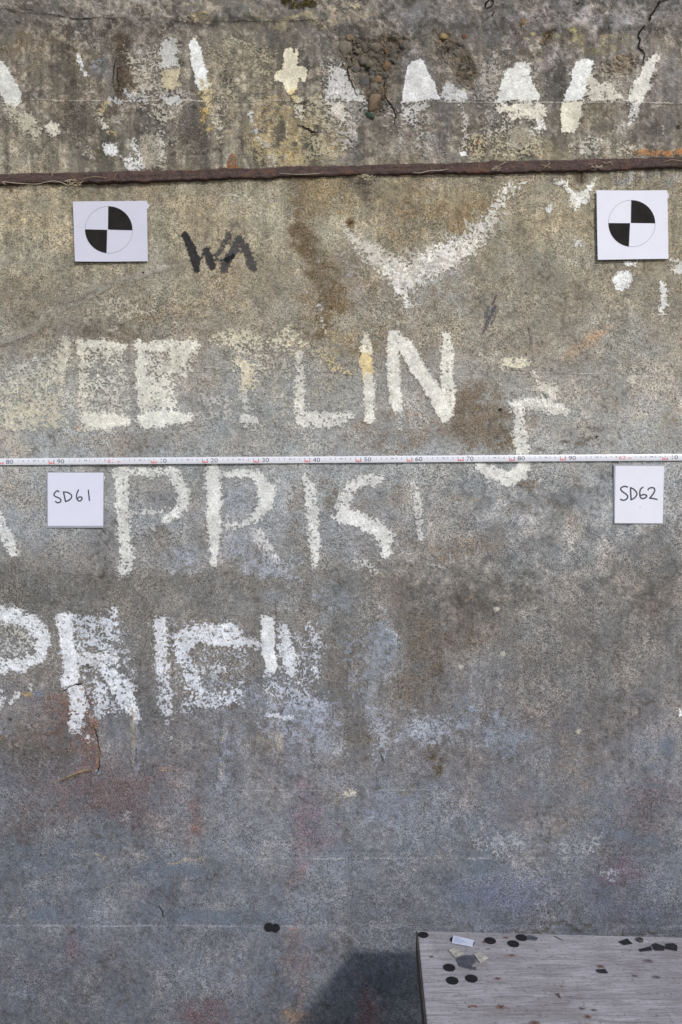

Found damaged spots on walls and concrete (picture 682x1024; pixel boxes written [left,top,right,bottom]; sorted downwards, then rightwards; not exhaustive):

crack [638,0,666,63]
crack [63,724,101,780]